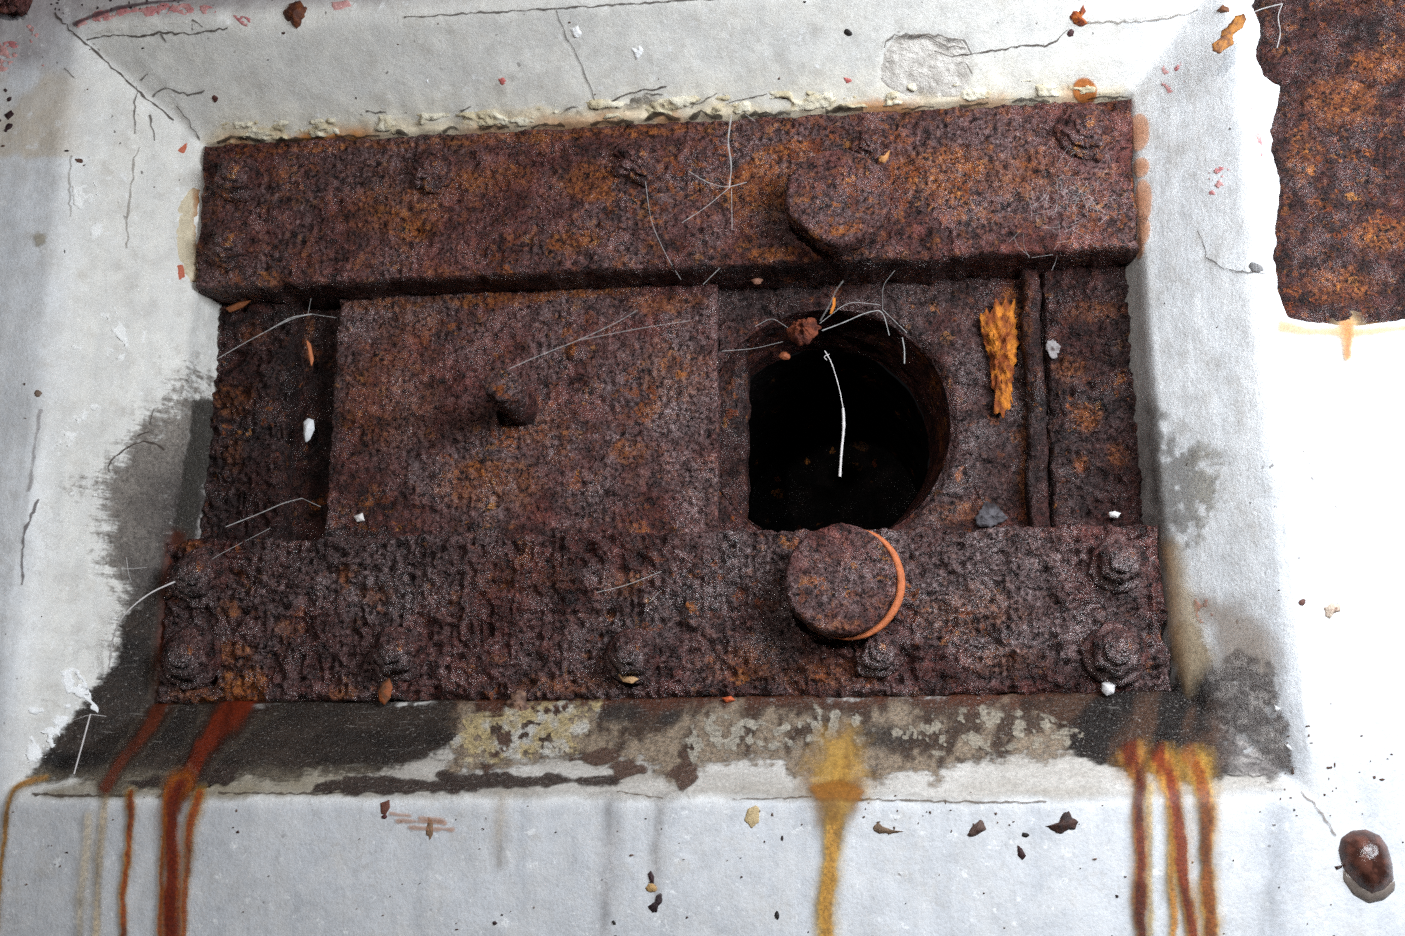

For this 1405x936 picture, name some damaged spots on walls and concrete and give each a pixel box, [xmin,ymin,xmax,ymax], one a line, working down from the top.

crack [54,0,228,248]
corrosion [979,297,1021,419]
damp [80,366,214,657]
corrosion [834,530,905,640]
damp [1162,545,1271,685]
damp [47,776,166,797]
corrosion [93,600,172,936]
corrosion [157,700,259,936]
damp [185,700,1164,801]
corrosion [806,733,864,936]
corrosion [1120,742,1220,936]
damp [1209,772,1282,793]